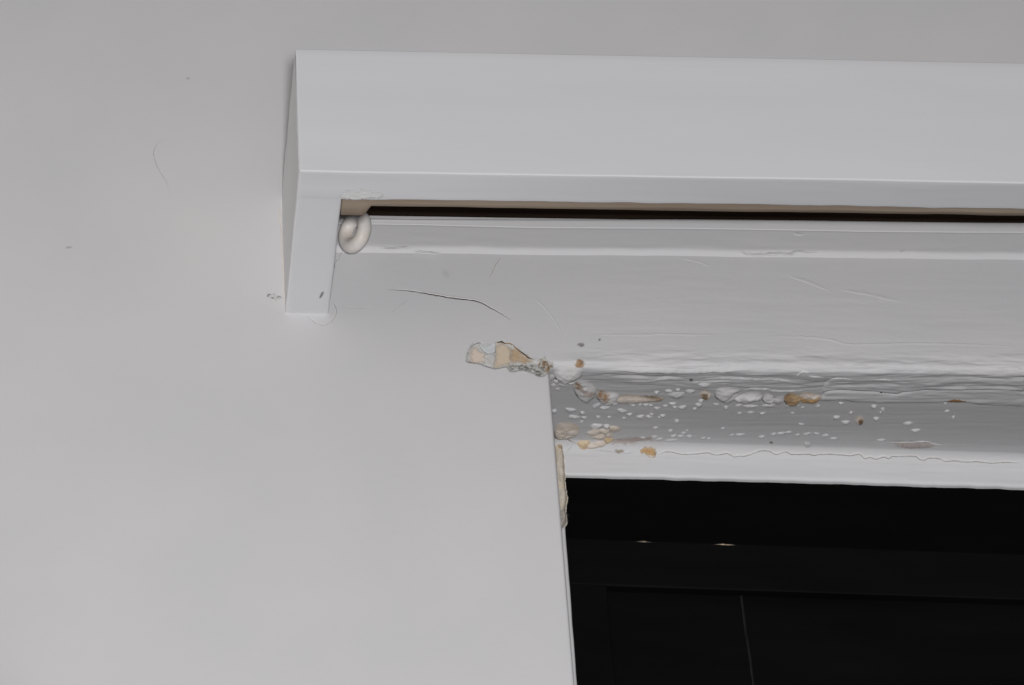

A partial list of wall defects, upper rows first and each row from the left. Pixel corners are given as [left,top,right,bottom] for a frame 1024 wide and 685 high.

crack [388,258,507,316]
peeling [466,341,554,377]
crack [658,448,1021,464]